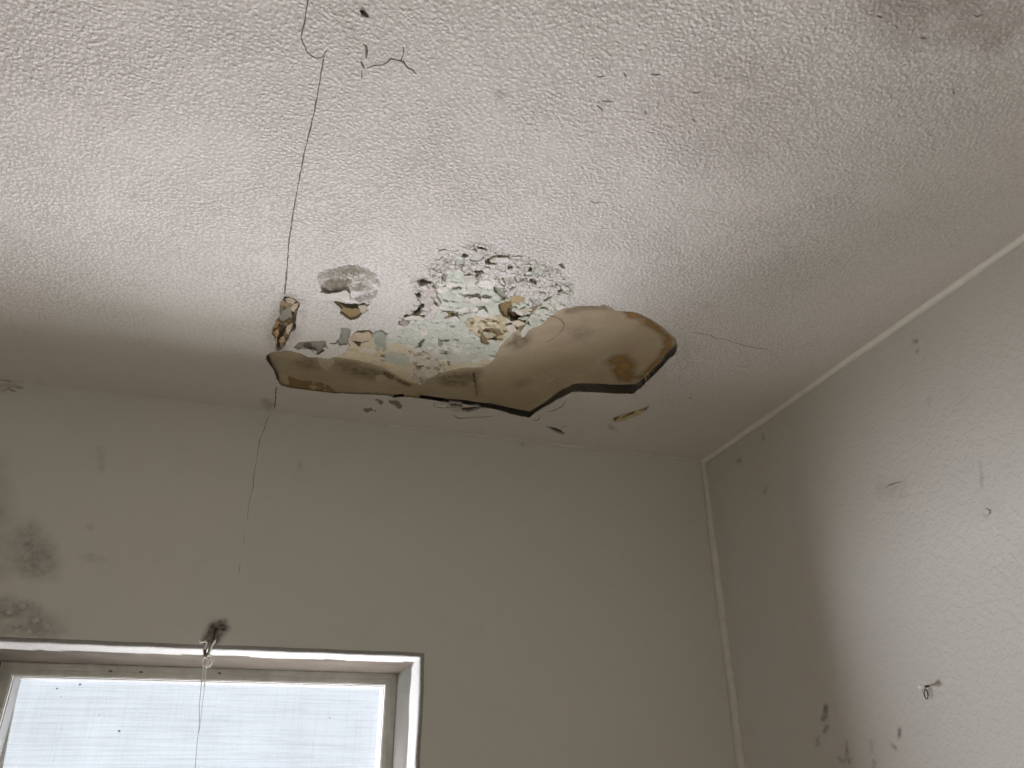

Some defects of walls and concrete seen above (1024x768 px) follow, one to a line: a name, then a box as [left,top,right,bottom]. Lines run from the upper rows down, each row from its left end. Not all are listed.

crack [284,0,327,298]
crack [360,44,416,77]
crack [244,355,279,540]
flaking render [266,241,678,419]
flaking render [612,405,650,423]